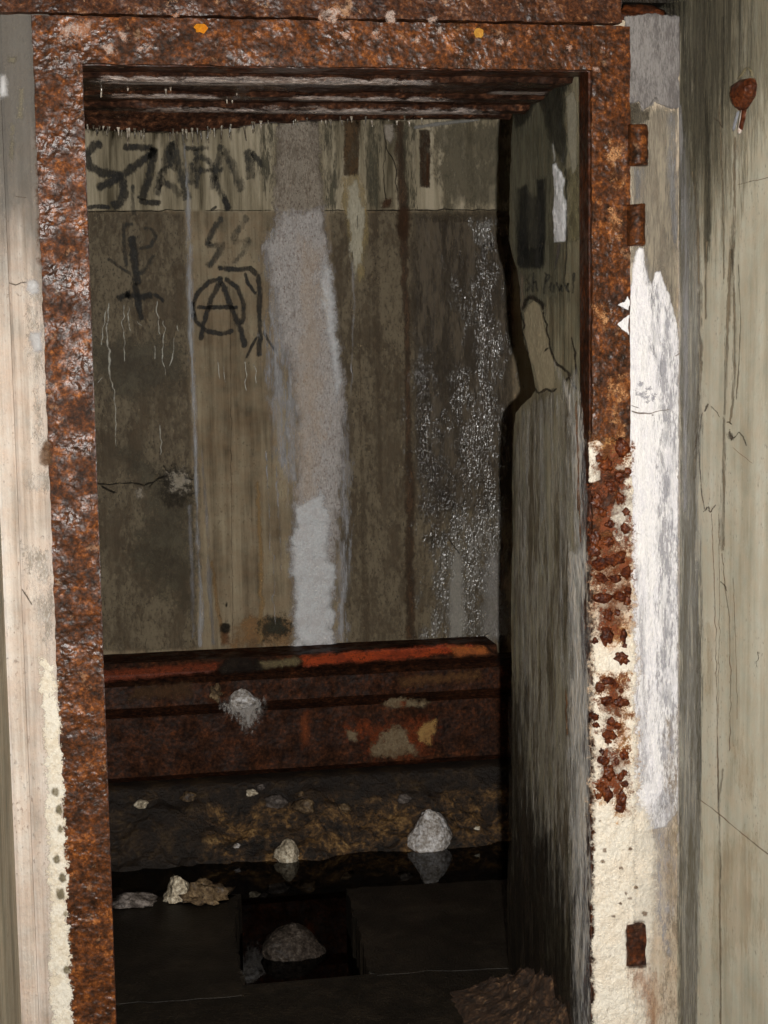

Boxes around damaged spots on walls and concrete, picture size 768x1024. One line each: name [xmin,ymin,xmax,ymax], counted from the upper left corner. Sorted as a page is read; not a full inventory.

damp [92,76,392,99]
corrosion [344,120,360,176]
corrosion [419,130,430,188]
corrosion [607,139,626,188]
corrosion [41,441,52,465]
crack [97,465,194,493]
spalling [156,464,195,509]
damp [232,0,768,1024]
corrosion [576,379,636,824]
crack [694,404,768,854]